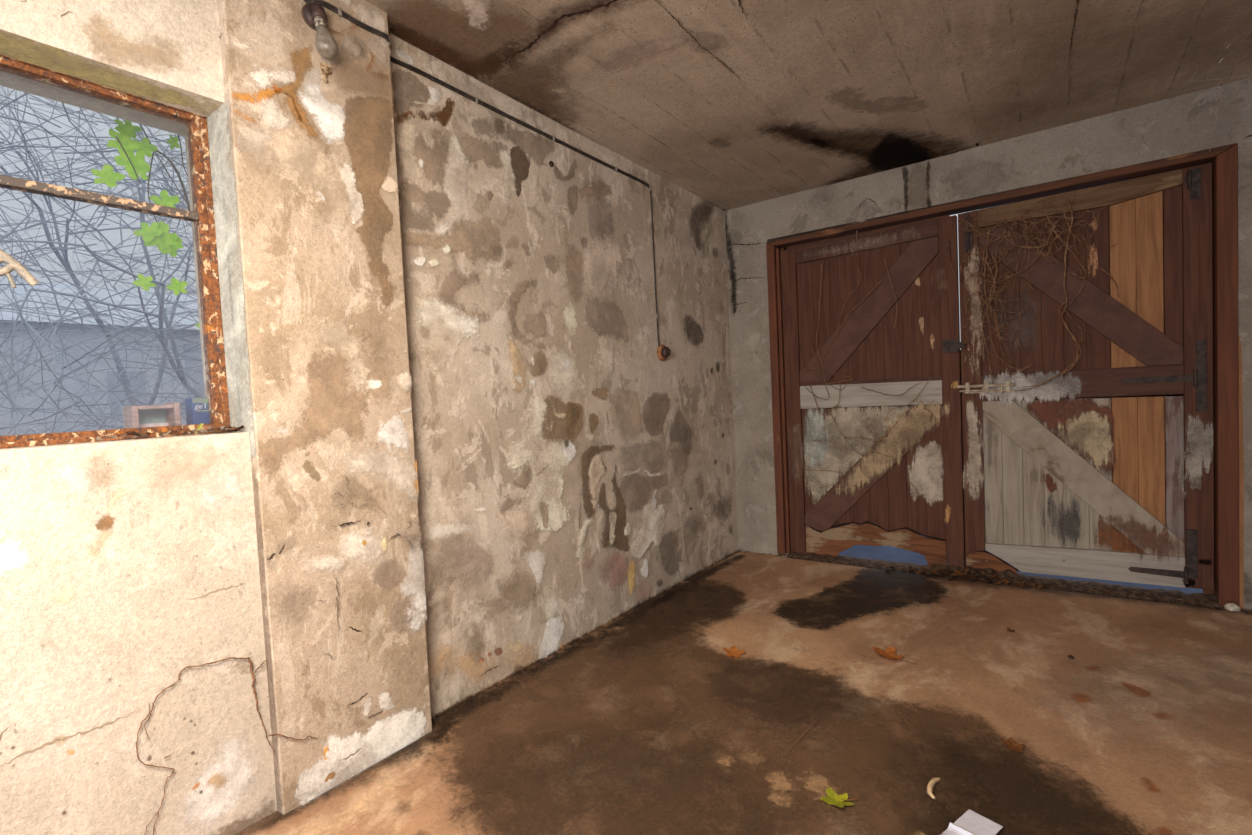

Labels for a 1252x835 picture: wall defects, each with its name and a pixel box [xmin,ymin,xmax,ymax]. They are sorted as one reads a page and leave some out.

corrosion [232,48,317,139]
peeling [331,0,489,105]
water stain [387,0,583,121]
crack [469,0,618,75]
crack [655,0,738,78]
water stain [769,123,1001,211]
peeling [577,454,665,578]
water stain [1069,652,1252,725]
peeling [294,692,427,808]
water stain [716,752,838,807]